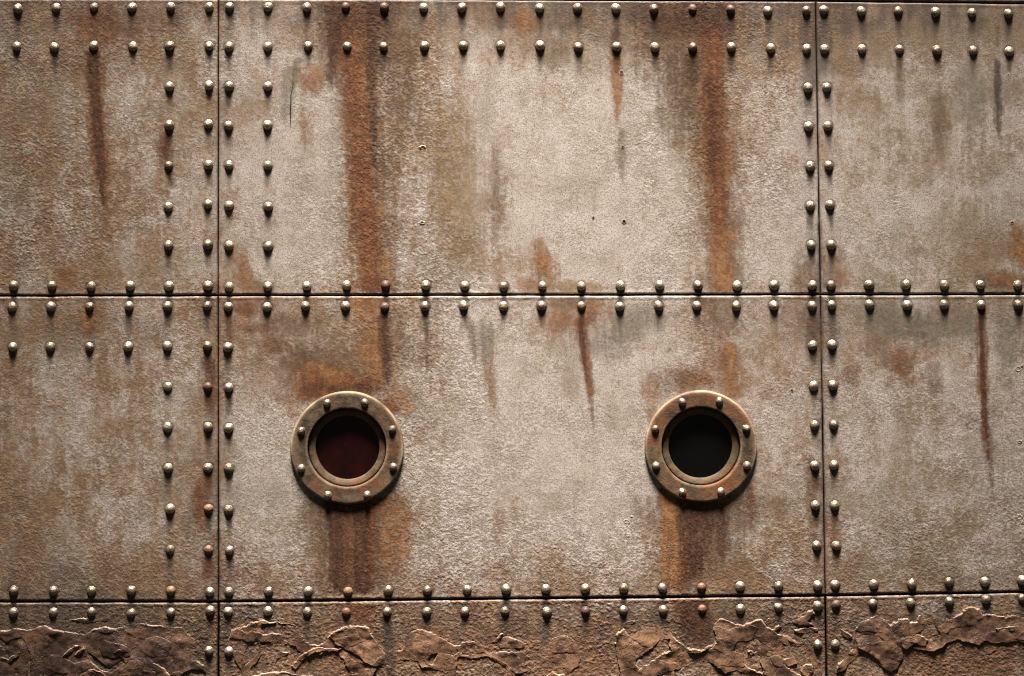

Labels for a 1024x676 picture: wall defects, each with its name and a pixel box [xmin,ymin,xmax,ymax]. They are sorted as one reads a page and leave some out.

corrosion [79,11,110,207]
corrosion [286,1,413,416]
corrosion [655,2,742,395]
corrosion [521,238,603,411]
corrosion [975,309,992,463]
corrosion [228,497,530,676]
corrosion [614,488,823,676]